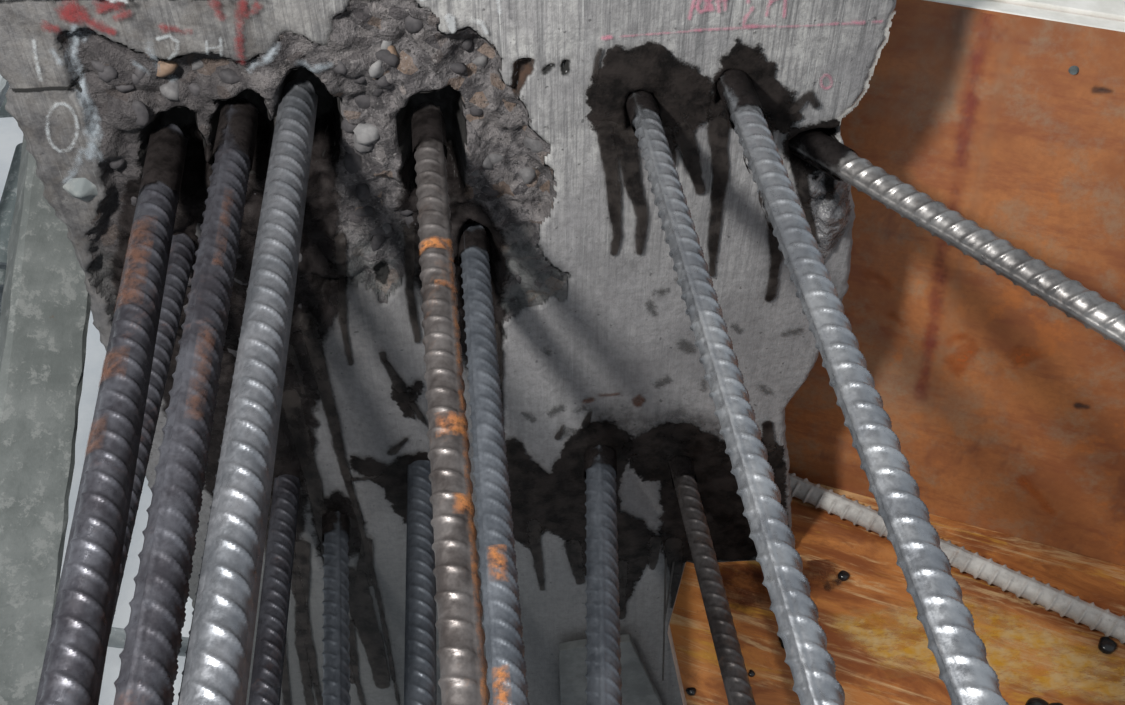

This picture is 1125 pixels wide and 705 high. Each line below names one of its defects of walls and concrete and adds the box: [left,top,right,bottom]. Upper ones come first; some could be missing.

leakage [592,48,602,80]
leakage [596,116,648,256]
leakage [663,116,729,277]
leakage [765,210,783,302]
spalling [35,0,570,705]
leakage [761,421,776,452]
leakage [282,311,400,705]
leakage [527,519,545,591]
leakage [564,539,585,585]
leakage [617,560,629,620]
leakage [720,567,770,608]
leakage [802,560,842,590]